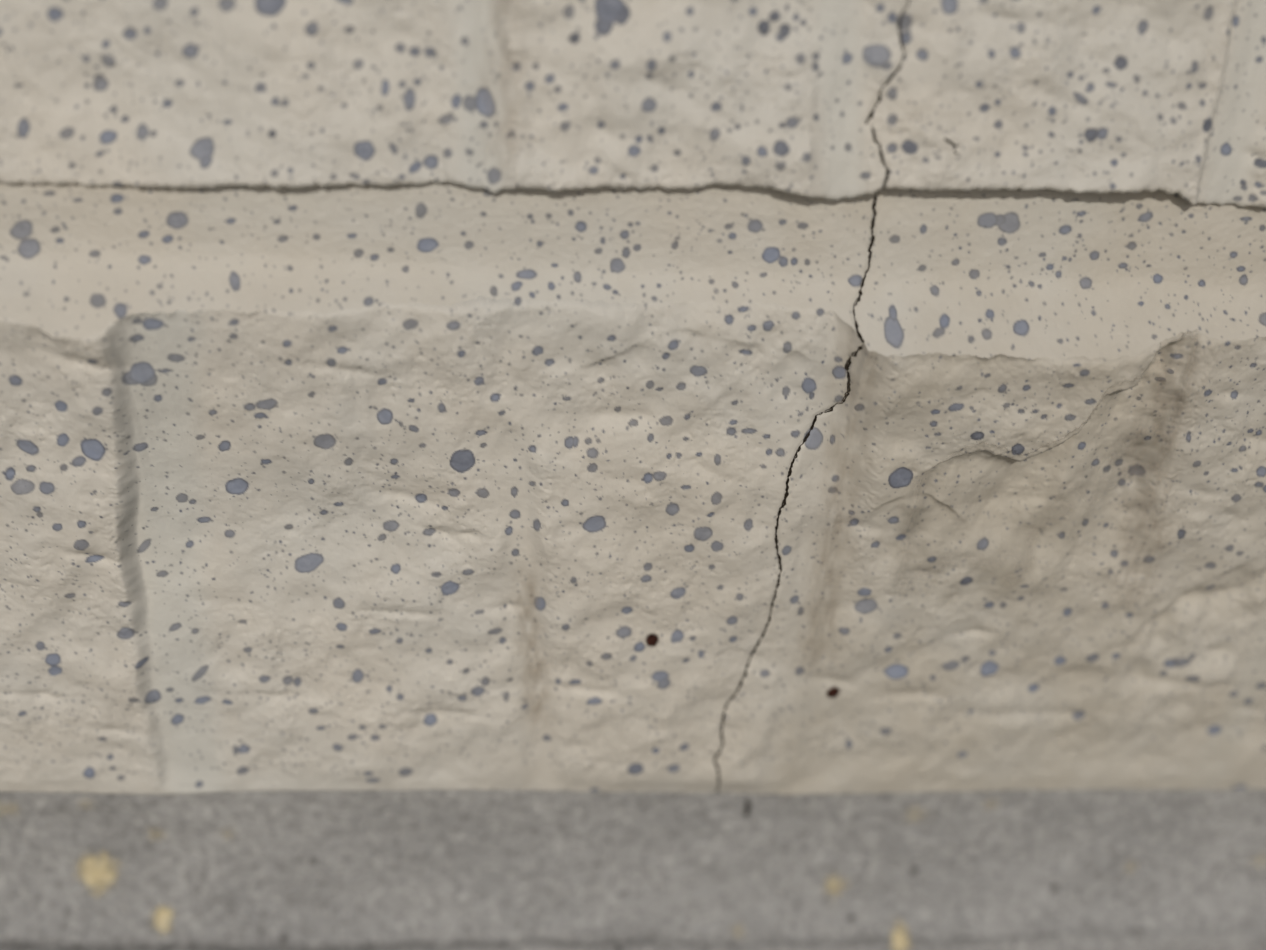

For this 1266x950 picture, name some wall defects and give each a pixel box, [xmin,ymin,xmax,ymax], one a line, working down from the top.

crack [944,137,961,154]
crack [714,0,910,792]
spalling [900,331,1196,587]